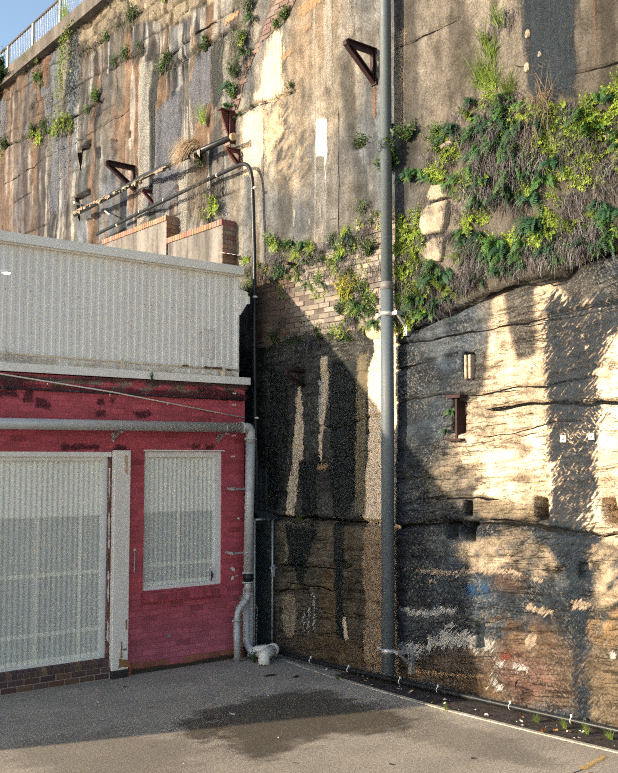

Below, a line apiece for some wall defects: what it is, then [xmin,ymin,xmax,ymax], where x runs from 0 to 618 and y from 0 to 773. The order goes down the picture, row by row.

leakage [521,0,579,103]
leakage [41,88,70,214]
leakage [181,691,407,758]